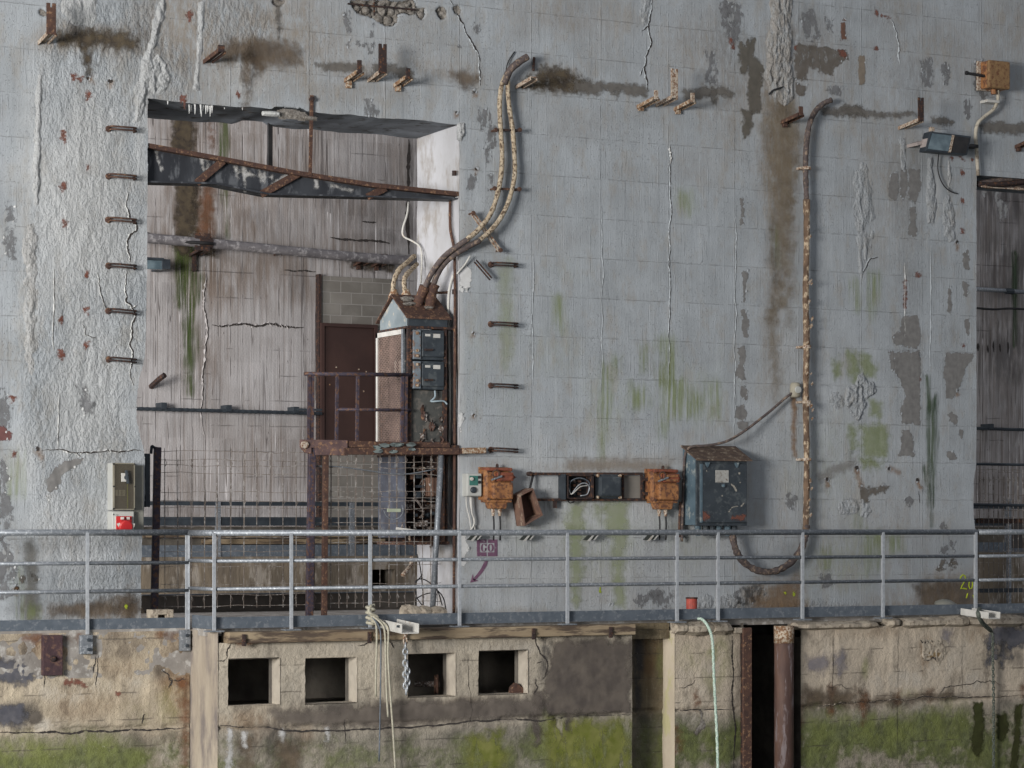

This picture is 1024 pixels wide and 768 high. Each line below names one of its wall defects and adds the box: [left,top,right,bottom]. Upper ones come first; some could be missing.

leakage [57,29,139,76]
spalling [343,0,461,55]
crack [450,0,481,85]
leakage [521,64,649,97]
crack [640,0,653,90]
peeling [794,9,866,97]
crack [97,192,138,386]
crack [666,144,674,373]
crack [41,394,141,457]
crack [200,265,304,433]
peeling [888,315,922,458]
leakage [971,702,1023,768]